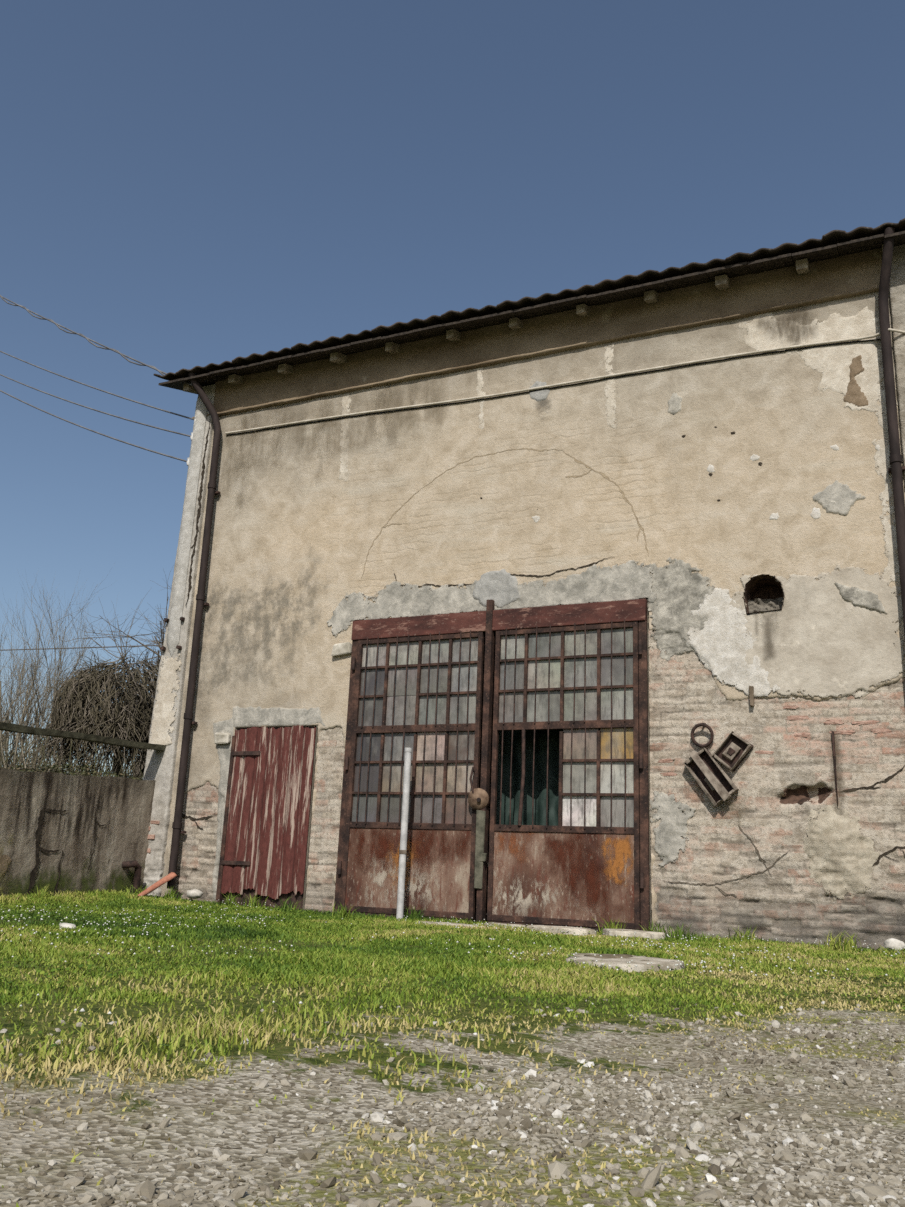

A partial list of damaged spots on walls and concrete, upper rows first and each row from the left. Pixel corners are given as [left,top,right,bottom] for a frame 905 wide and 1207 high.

peeling [738,299,899,586]
water stain [16,774,126,833]
spalling [648,583,905,950]
crack [838,765,905,792]
corrosion [357,830,466,899]
corrosion [494,872,556,912]
corrosion [548,835,631,906]
crack [668,824,788,897]